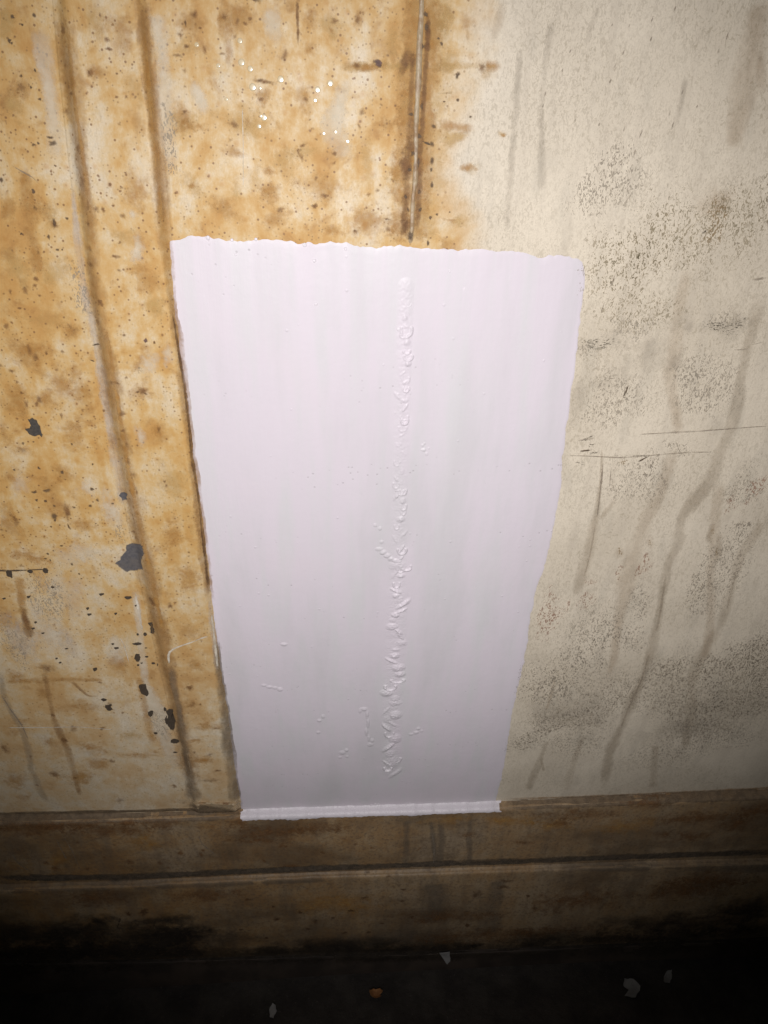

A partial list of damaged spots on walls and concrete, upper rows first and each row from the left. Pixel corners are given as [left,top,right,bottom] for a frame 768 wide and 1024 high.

corrosion [74,99,88,211]
corrosion [137,16,167,214]
corrosion [394,0,434,230]
peeling [25,418,42,437]
corrosion [173,307,212,589]
peeling [116,532,144,572]
corrosion [108,384,167,639]
corrosion [217,652,225,694]
corrosion [223,712,235,757]